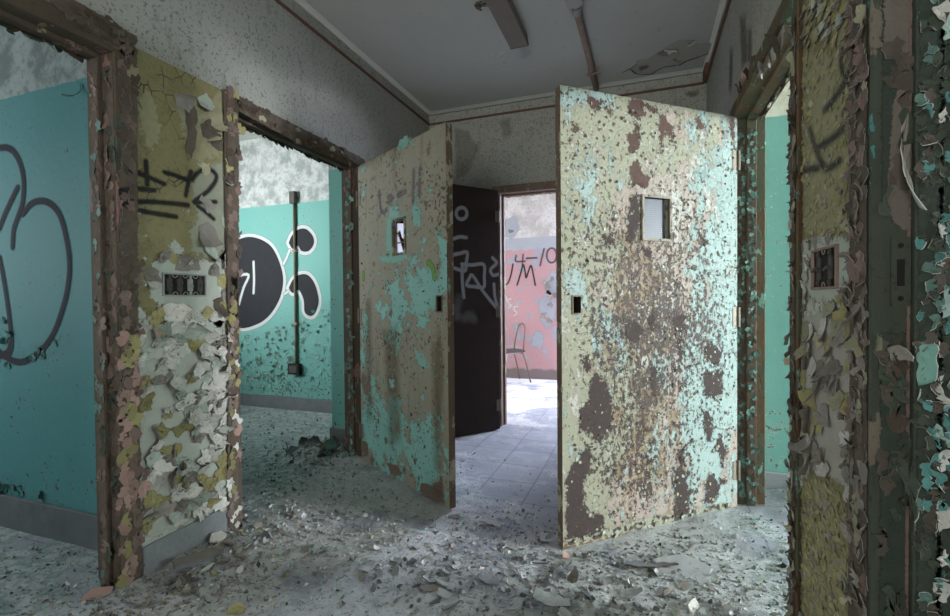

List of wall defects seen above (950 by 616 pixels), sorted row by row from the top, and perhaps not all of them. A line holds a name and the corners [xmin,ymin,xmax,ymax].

peeling [0,0,360,601]
peeling [505,127,760,616]
peeling [630,40,712,74]
peeling [734,0,950,616]